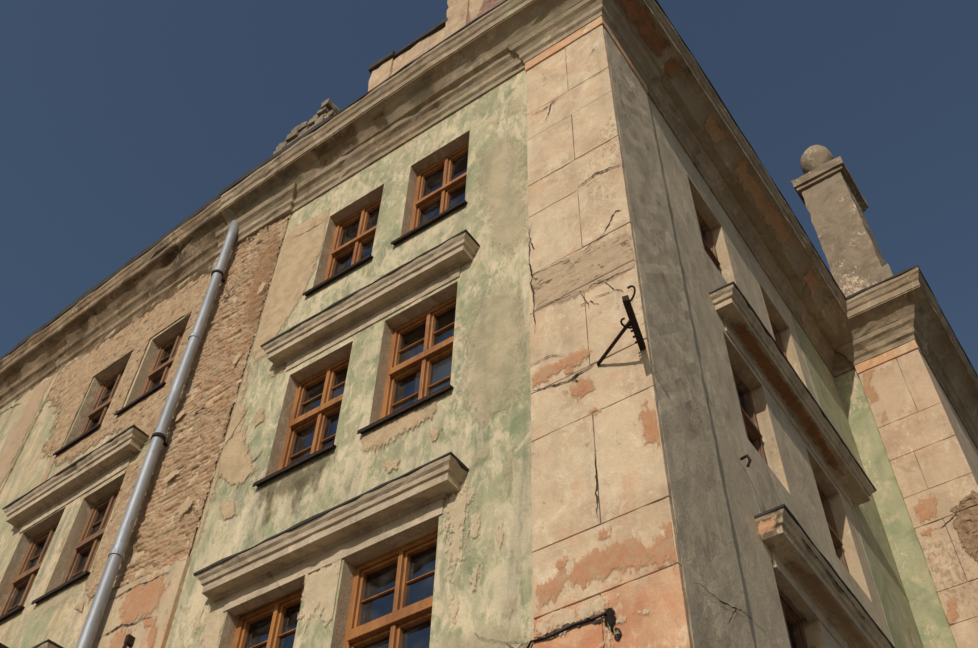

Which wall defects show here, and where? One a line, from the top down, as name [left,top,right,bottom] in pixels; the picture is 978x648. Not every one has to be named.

peeling [532,348,594,398]
spalling [0,207,330,648]
peeling [638,399,660,448]
peeling [440,484,480,580]
crack [592,455,600,516]
peeling [913,493,937,535]
spalling [950,490,978,563]
peeling [518,520,676,648]